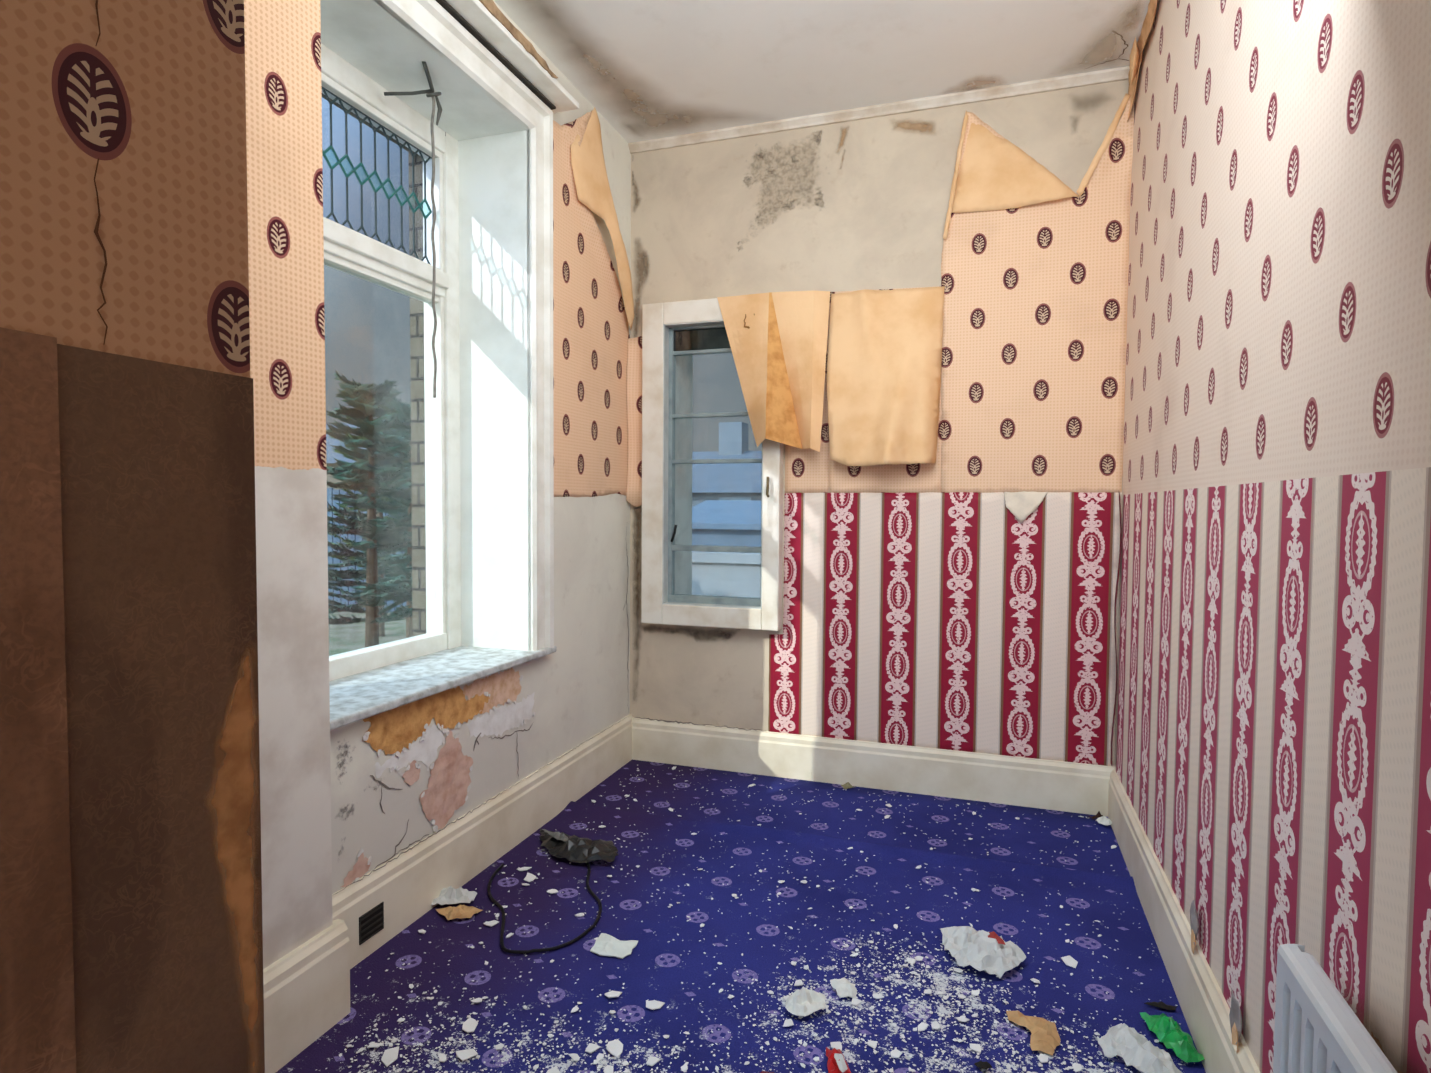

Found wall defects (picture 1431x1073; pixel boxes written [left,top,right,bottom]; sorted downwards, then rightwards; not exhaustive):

crack [94,0,102,46]
crack [94,158,108,345]
flaking render [362,667,536,832]